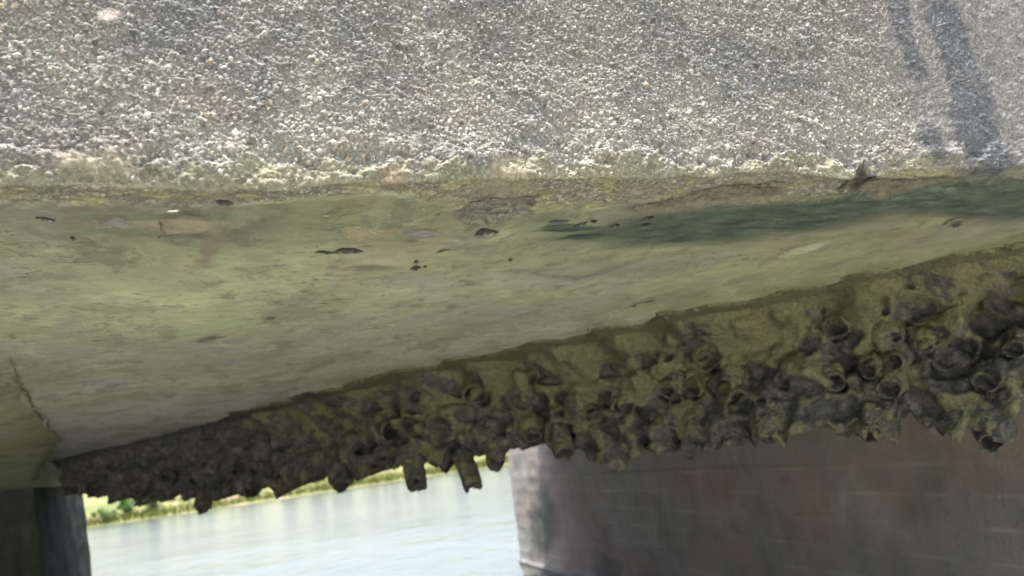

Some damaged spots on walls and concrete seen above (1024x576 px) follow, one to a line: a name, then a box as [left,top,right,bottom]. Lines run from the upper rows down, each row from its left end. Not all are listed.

damp [888,0,1024,175]
spalling [458,195,539,236]
spalling [838,165,952,199]
crack [9,357,64,442]